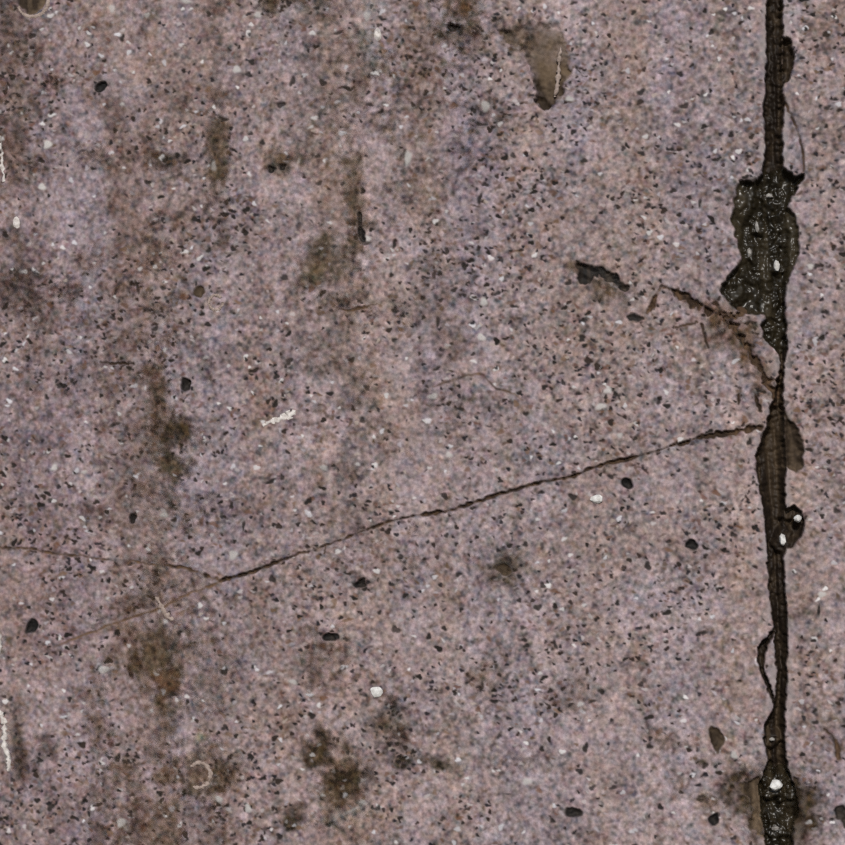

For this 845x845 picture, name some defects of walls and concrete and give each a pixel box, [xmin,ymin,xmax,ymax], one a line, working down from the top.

spalling [497,20,574,112]
spalling [568,261,631,293]
crack [335,302,379,313]
spalling [626,312,645,324]
crack [99,359,136,367]
crack [432,371,524,401]
crack [644,0,811,845]
crack [0,422,766,609]